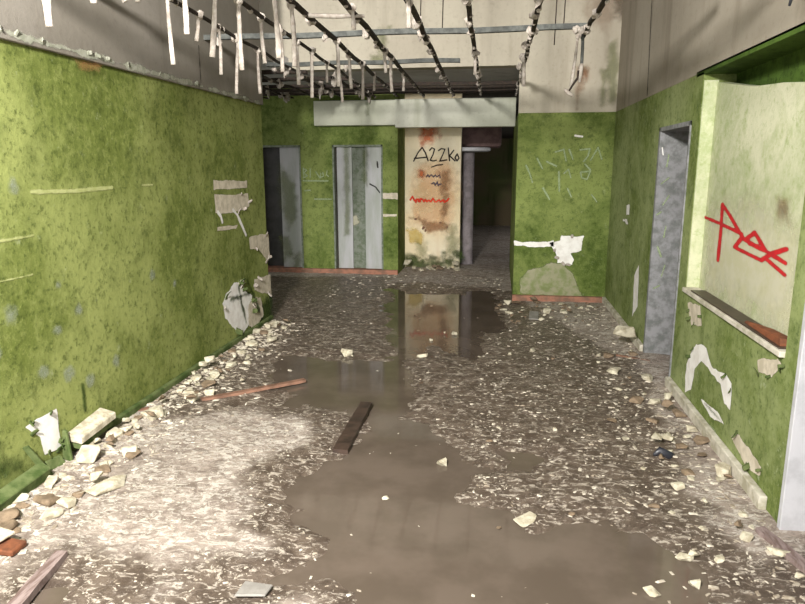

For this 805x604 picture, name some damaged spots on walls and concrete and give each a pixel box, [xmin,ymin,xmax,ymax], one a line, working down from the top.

corrosion [422,128,435,144]
peeling [213,180,272,264]
peeling [514,235,584,266]
peeling [223,274,273,335]
peeling [685,344,732,410]
peeling [26,409,65,459]
peeling [701,399,723,423]
peeling [731,430,762,476]